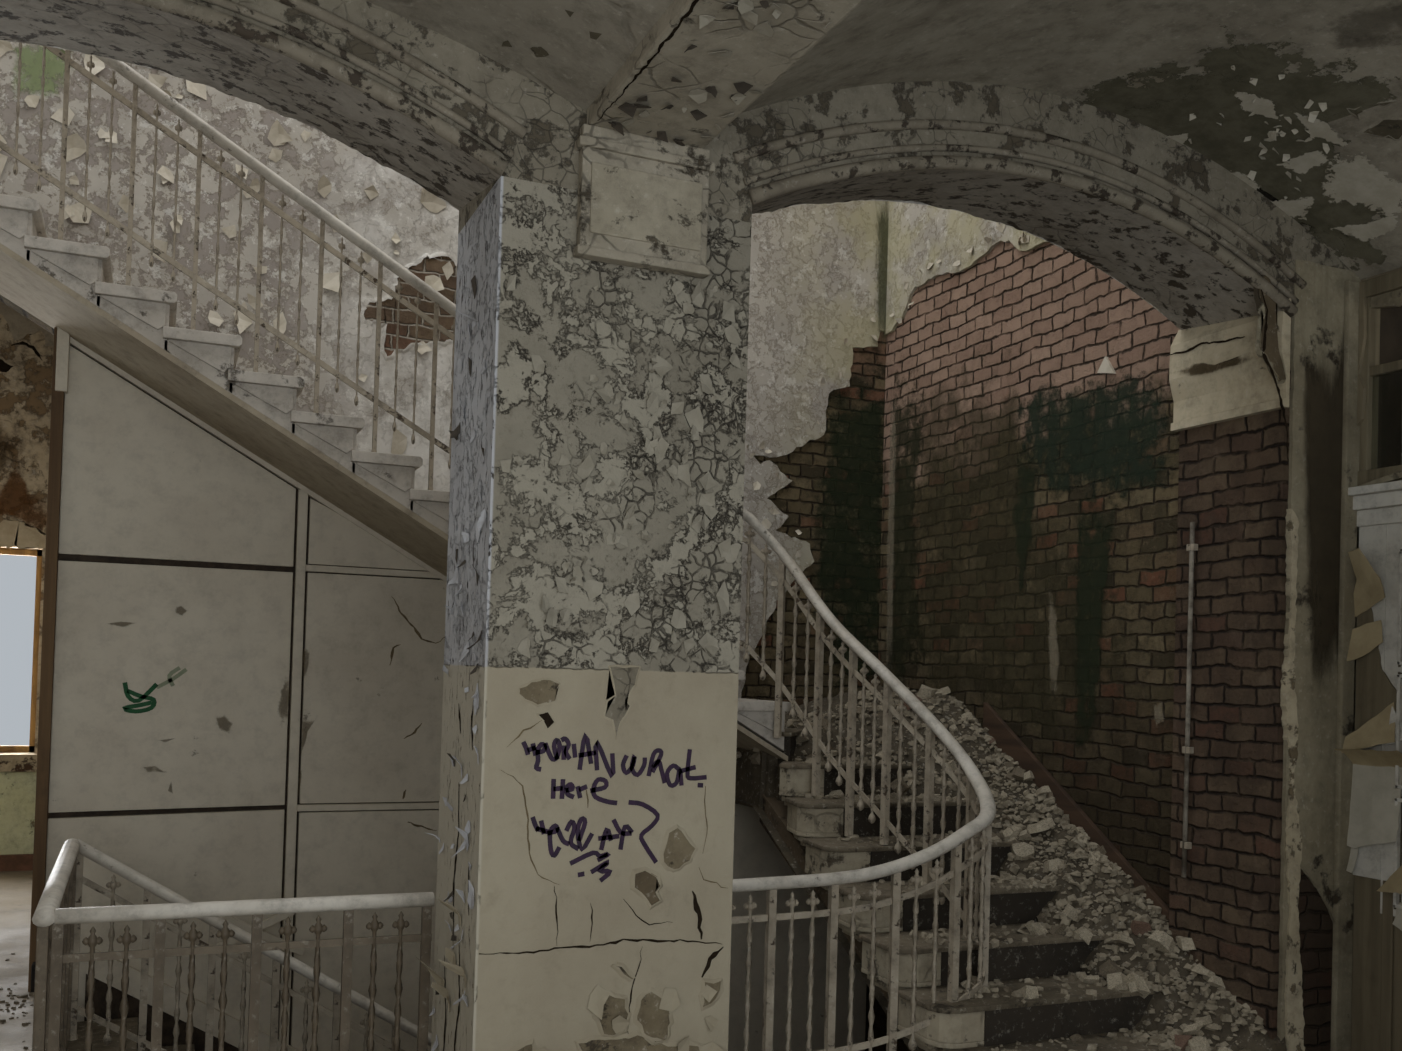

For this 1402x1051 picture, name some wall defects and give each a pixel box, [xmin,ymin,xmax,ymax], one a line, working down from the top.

peeling [84,54,105,75]
crack [597,0,699,121]
peeling [50,106,117,185]
flaking render [360,232,485,377]
peeling [589,355,718,533]
peeling [0,518,46,549]
crack [390,596,445,665]
crack [458,699,474,751]
peeling [603,665,641,739]
flaking render [1280,509,1335,1051]
crack [402,720,725,1051]
flaking render [574,962,724,1051]